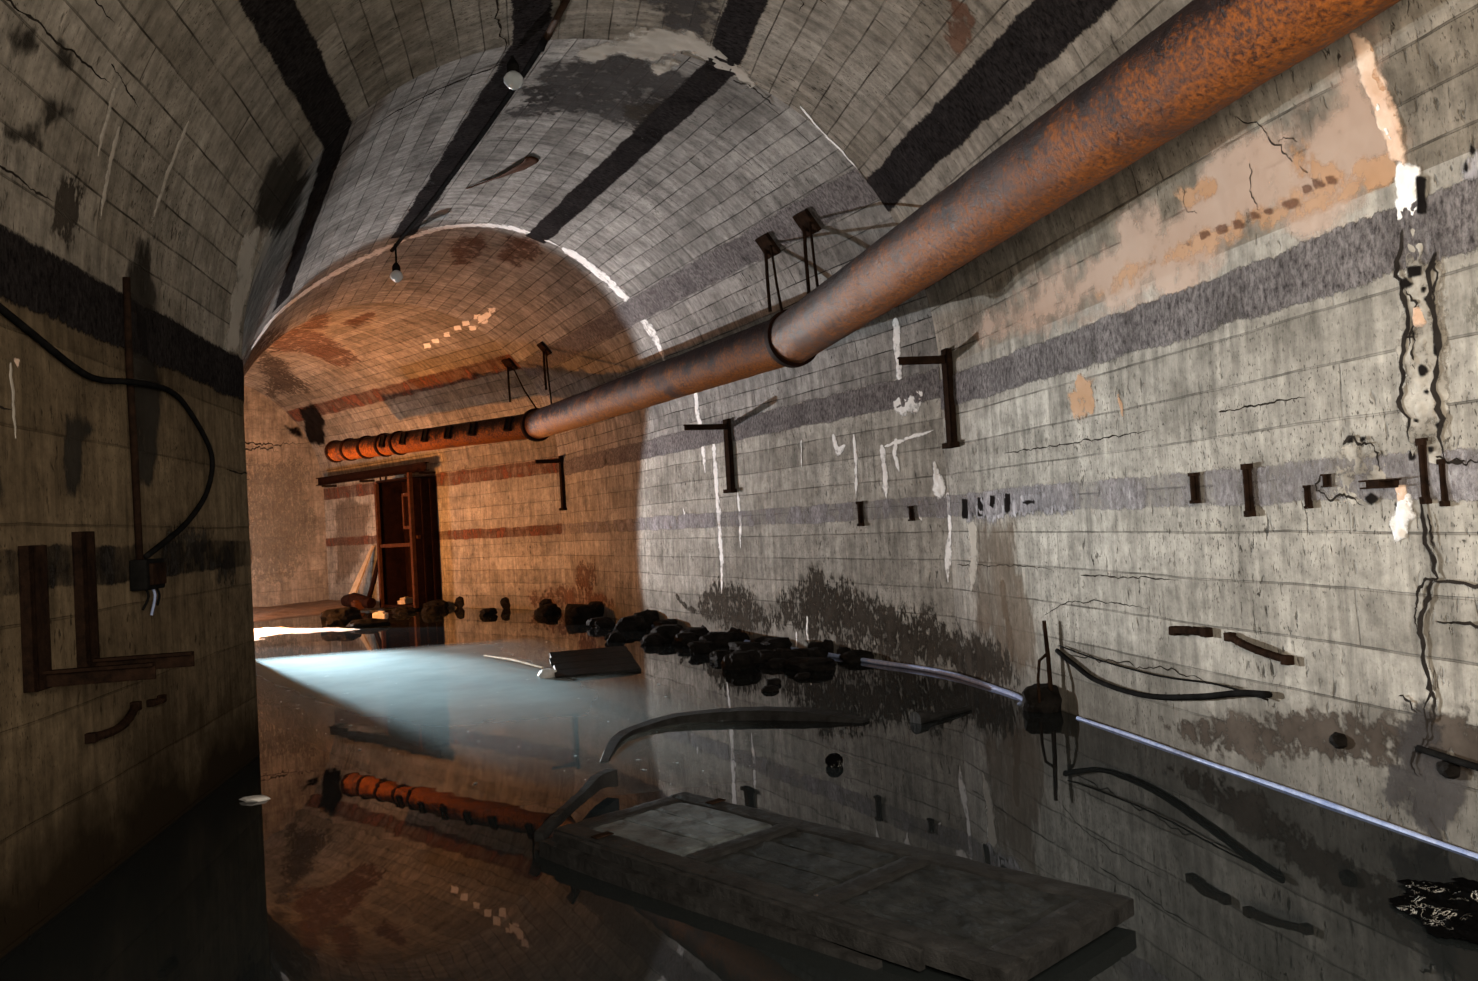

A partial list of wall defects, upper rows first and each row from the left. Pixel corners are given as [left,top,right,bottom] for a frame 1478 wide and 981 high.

damp [10,30,38,52]
damp [58,39,73,69]
damp [5,100,69,150]
spalling [1462,145,1478,181]
spalling [1187,177,1336,246]
damp [226,145,630,446]
crack [1393,229,1465,465]
damp [694,393,702,424]
damp [675,444,1035,688]
crack [1399,504,1478,746]